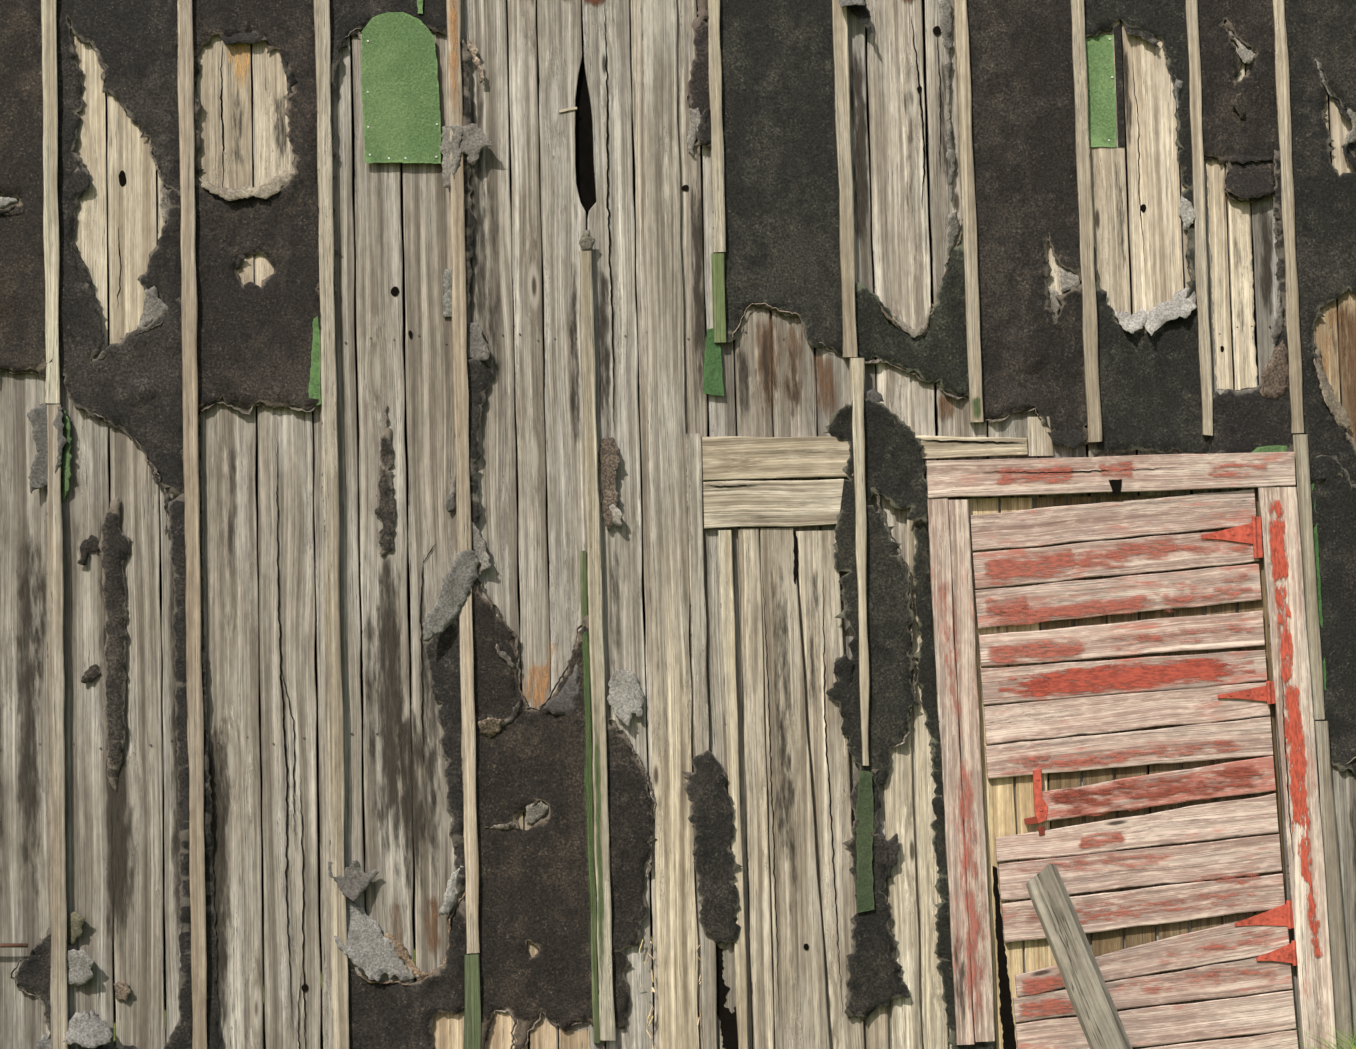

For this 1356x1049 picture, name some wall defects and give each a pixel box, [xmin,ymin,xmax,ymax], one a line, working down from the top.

peeling [67,17,171,361]
peeling [194,30,298,201]
peeling [235,254,274,287]
peeling [1046,236,1081,318]
peeling [1086,19,1289,400]
peeling [1315,59,1356,176]
peeling [1313,289,1356,454]
peeling [984,538,1251,625]
peeling [989,633,1255,697]
peeling [1002,740,1262,816]
peeling [1269,500,1323,957]
peeling [958,765,986,1009]